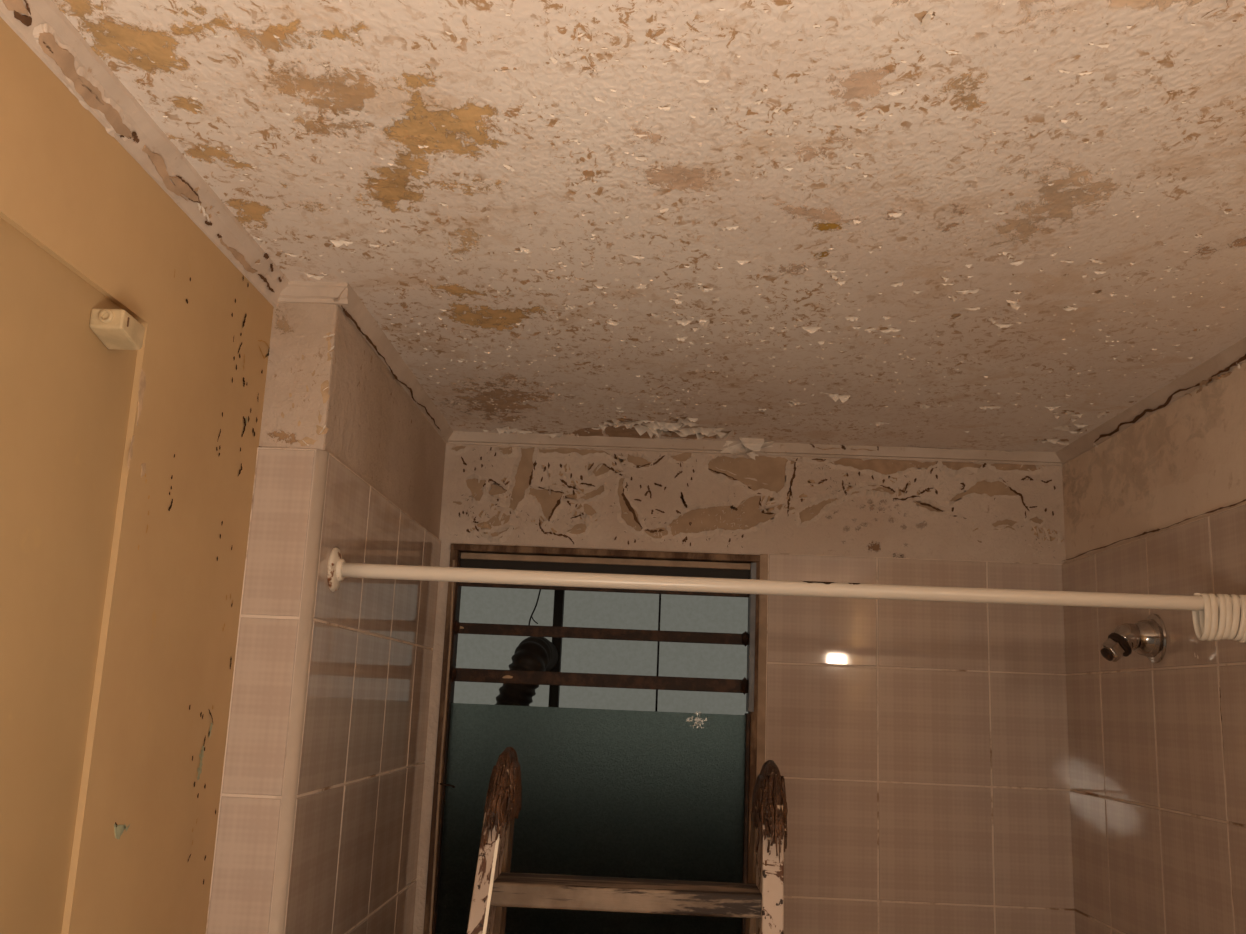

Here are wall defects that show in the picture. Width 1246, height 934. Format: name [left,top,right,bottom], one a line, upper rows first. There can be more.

peeling [914,7,950,30]
flaking render [2,0,274,292]
peeling [324,239,356,253]
peeling [231,298,259,476]
crack [341,305,440,429]
peeling [644,283,728,345]
peeling [785,393,850,406]
peeling [780,313,916,345]
peeling [940,248,1024,329]
crack [1094,354,1246,443]
flaking render [449,397,1064,546]